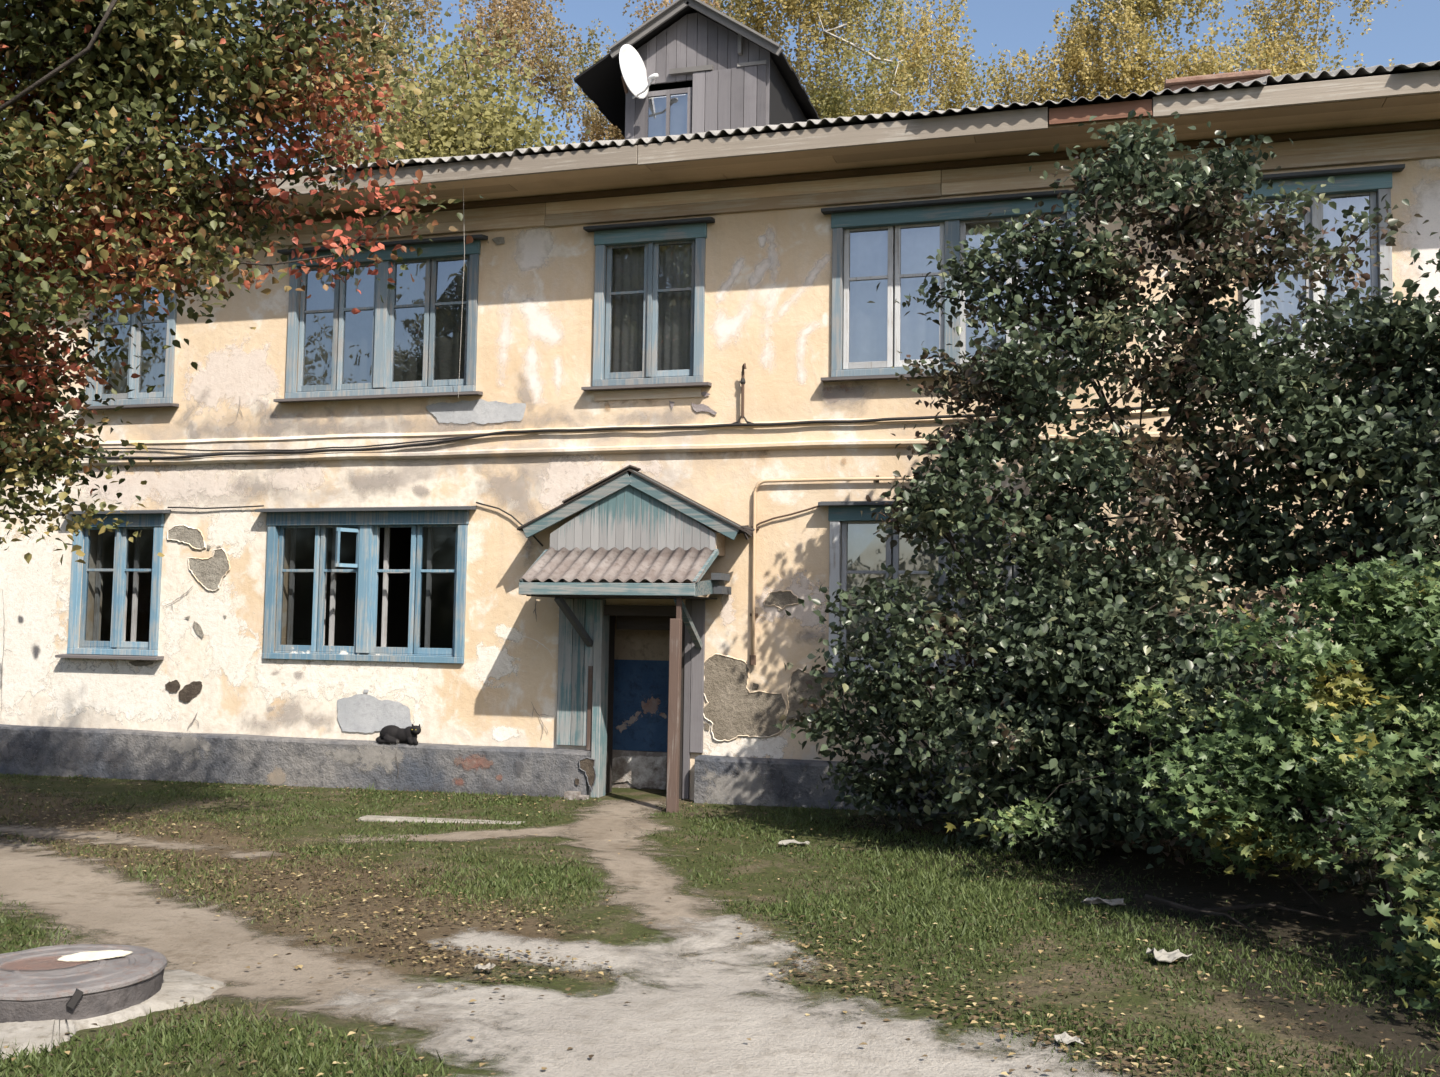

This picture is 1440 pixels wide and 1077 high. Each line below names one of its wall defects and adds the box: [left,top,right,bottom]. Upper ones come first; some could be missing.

peeling [488,229,552,271]
peeling [713,229,828,366]
peeling [499,299,562,403]
peeling [798,323,819,383]
peeling [0,461,428,762]
peeling [616,696,667,732]
flaking render [702,653,830,806]